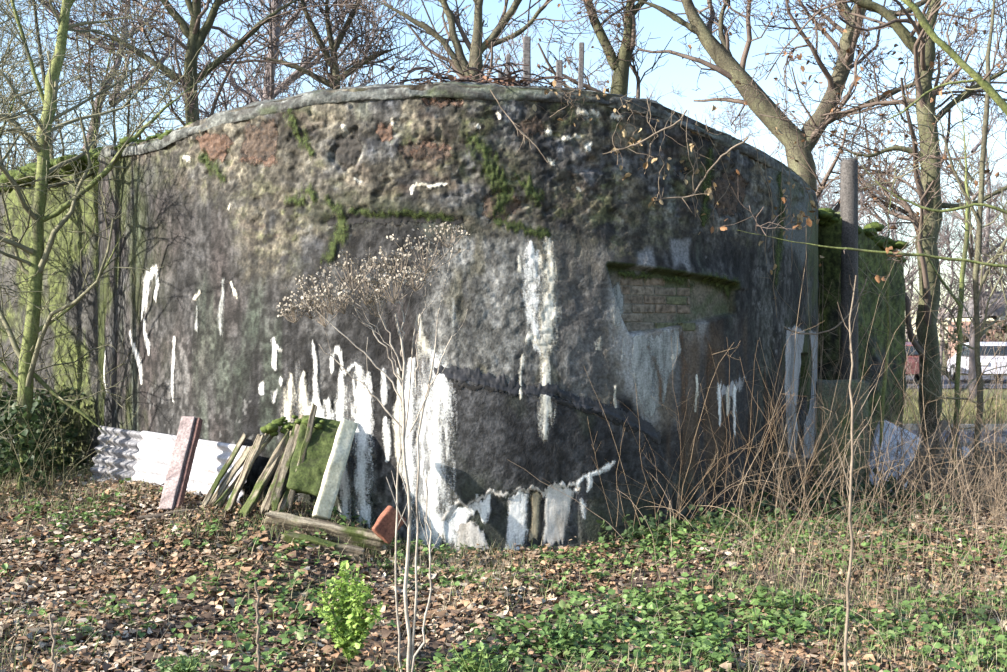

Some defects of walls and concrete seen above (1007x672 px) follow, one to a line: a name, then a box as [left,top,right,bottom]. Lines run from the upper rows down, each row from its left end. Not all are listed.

leakage [129,265,159,384]
leakage [218,279,237,335]
leakage [259,314,458,547]
leakage [518,236,558,440]
spalling [630,329,681,417]
leakage [717,377,746,434]